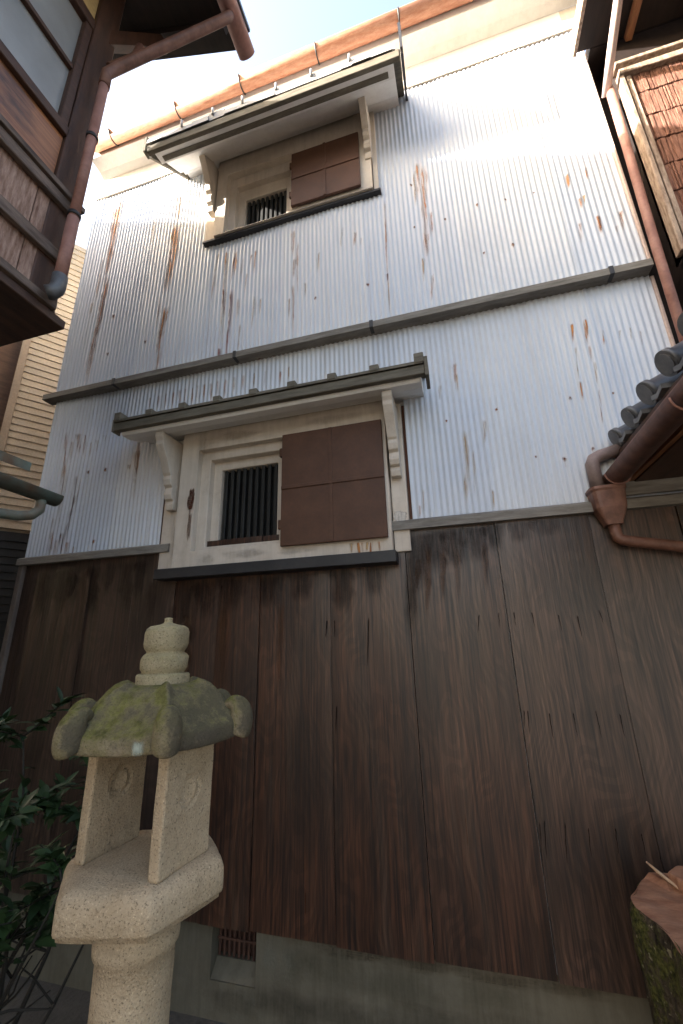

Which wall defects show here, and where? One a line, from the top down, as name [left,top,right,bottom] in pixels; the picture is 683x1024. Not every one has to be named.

rust [86,201,122,373]